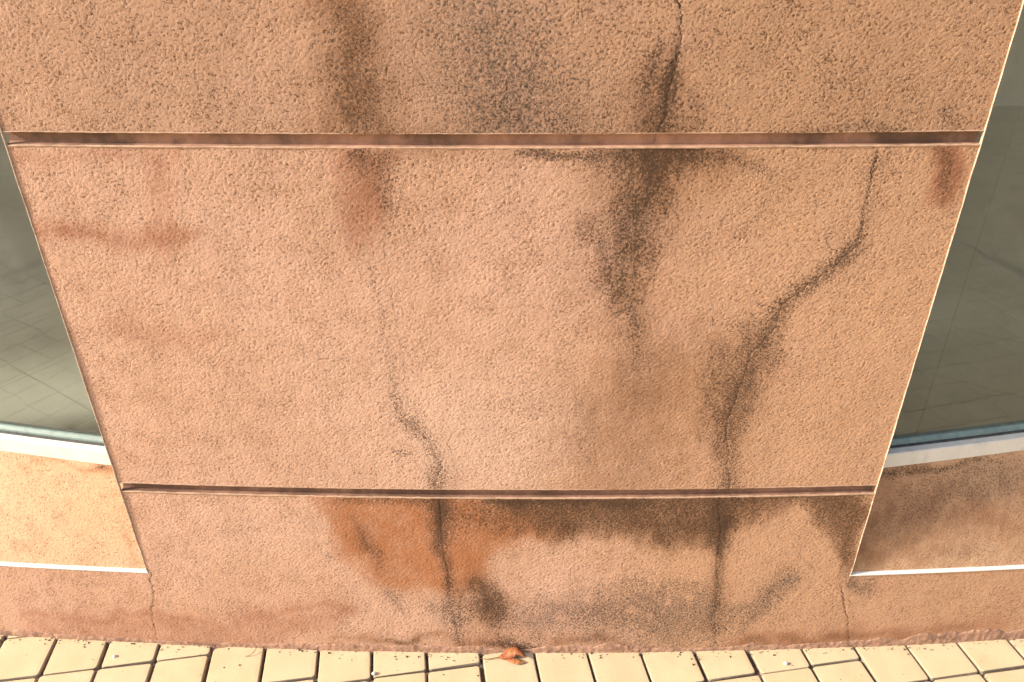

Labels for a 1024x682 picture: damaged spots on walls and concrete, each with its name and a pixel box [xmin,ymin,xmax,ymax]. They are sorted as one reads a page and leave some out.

water stain [277,0,640,134]
crack [601,0,738,134]
crack [354,253,458,490]
water stain [8,146,1024,649]
crack [698,147,888,489]
crack [375,583,467,636]
rust [298,496,566,603]
crack [701,517,743,624]